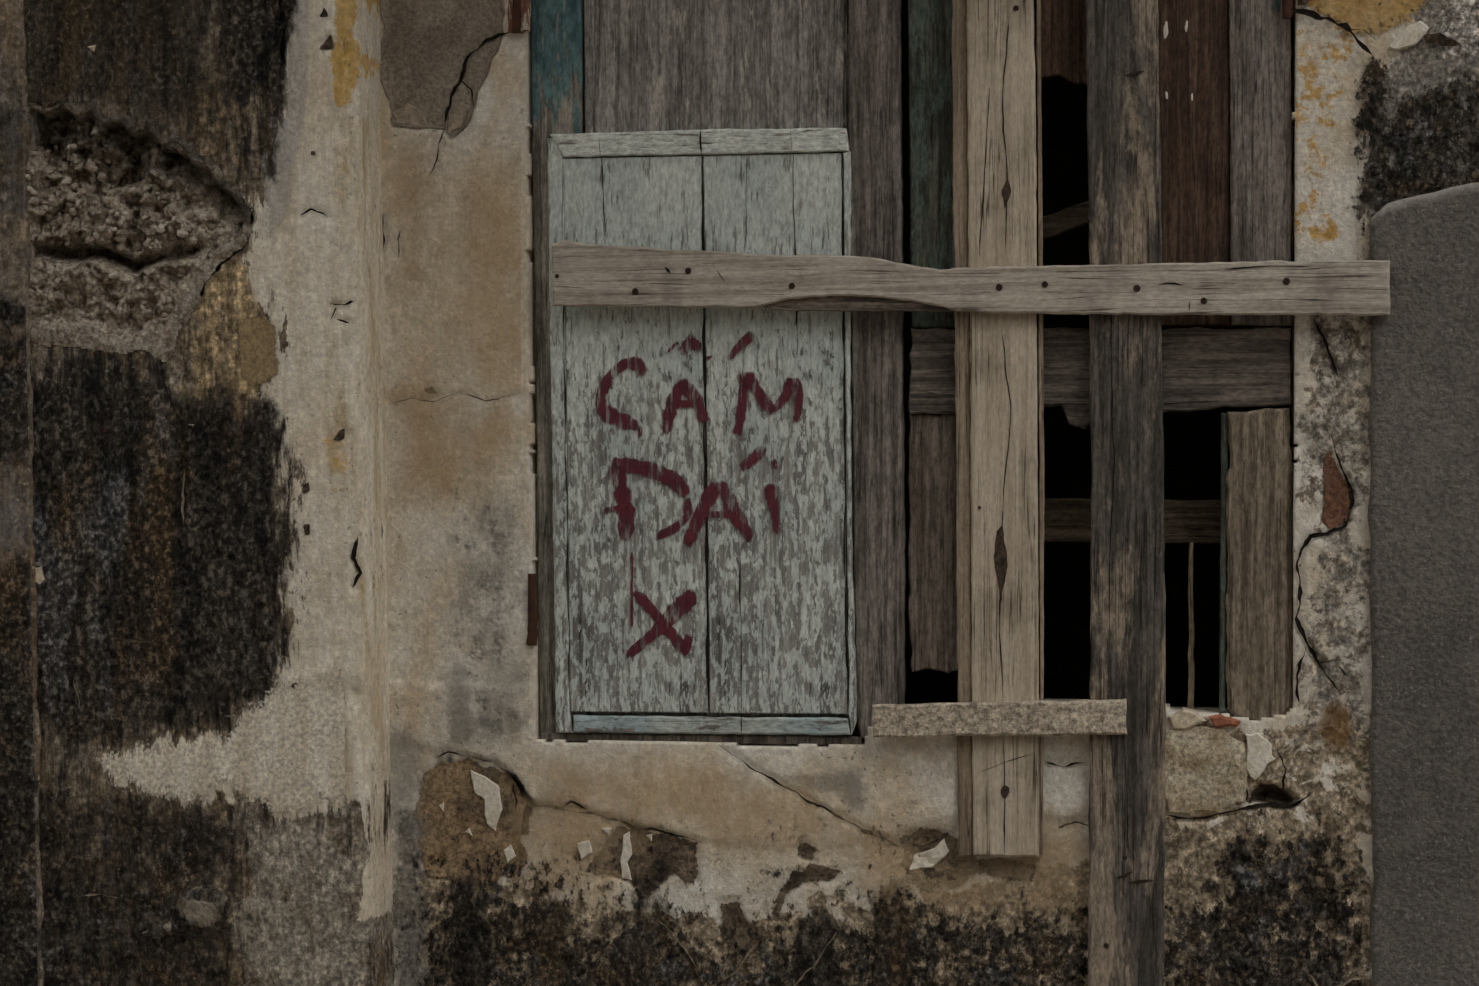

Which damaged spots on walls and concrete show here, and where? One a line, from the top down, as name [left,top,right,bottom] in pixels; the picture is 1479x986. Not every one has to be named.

flaking render [380,0,503,138]
crack [429,33,507,176]
crack [1291,9,1376,56]
peeling [1298,0,1431,50]
leakage [1347,55,1479,236]
spalling [0,101,251,362]
crack [1295,434,1355,706]
flaking render [415,757,528,895]
flaking render [577,825,699,899]
leakage [394,825,1089,986]
crack [718,744,956,874]
leakage [1164,790,1363,986]